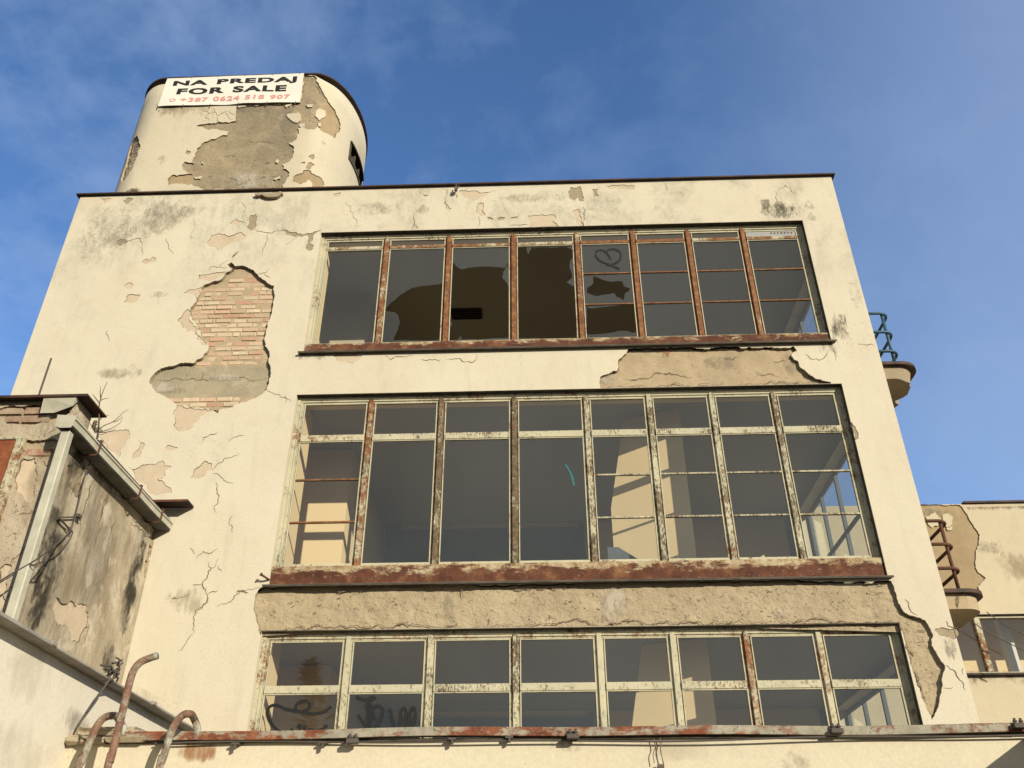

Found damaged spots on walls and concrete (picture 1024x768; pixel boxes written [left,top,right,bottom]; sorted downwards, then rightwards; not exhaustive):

flaking render [168,75,341,190]
peeling [460,190,558,228]
flaking render [149,262,275,431]
flaking render [599,346,831,388]
peeling [99,429,177,495]
crack [202,433,243,528]
water stain [31,508,61,630]
water stain [85,527,113,589]
water stain [125,541,146,614]
crack [172,548,258,649]
flaking render [920,504,986,590]
rust [185,744,215,761]